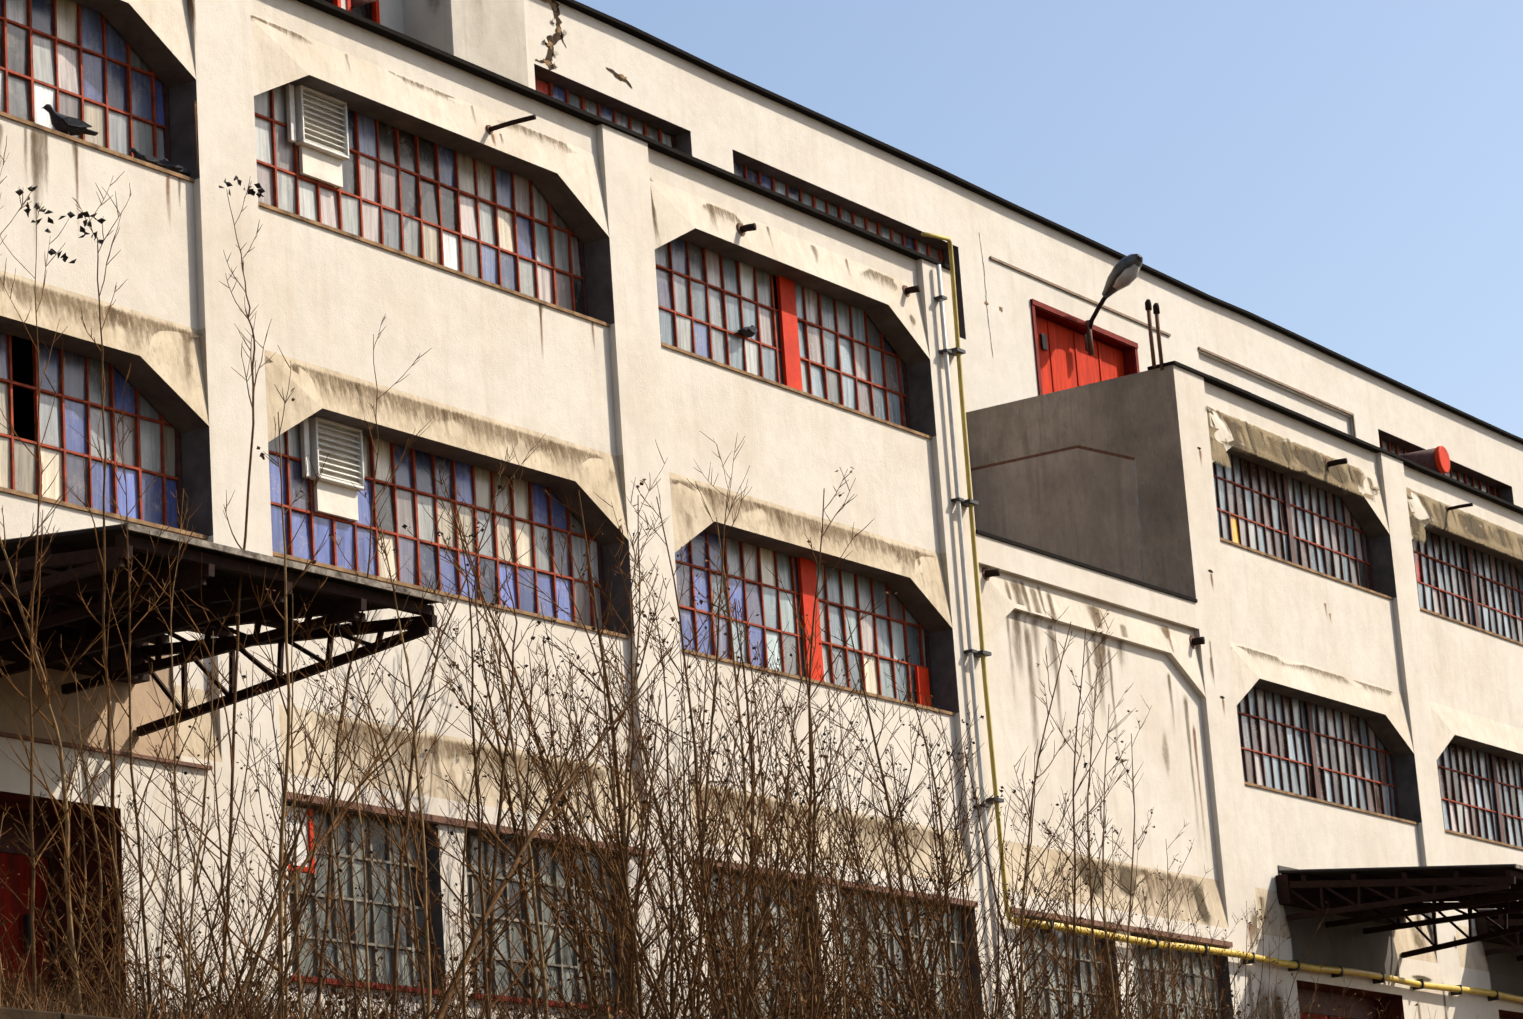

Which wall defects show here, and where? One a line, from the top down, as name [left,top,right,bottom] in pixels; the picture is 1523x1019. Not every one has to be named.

crack [535,0,567,71]
water stain [25,128,48,192]
water stain [1007,582,1060,715]
water stain [1086,606,1127,708]
water stain [1184,699,1201,796]